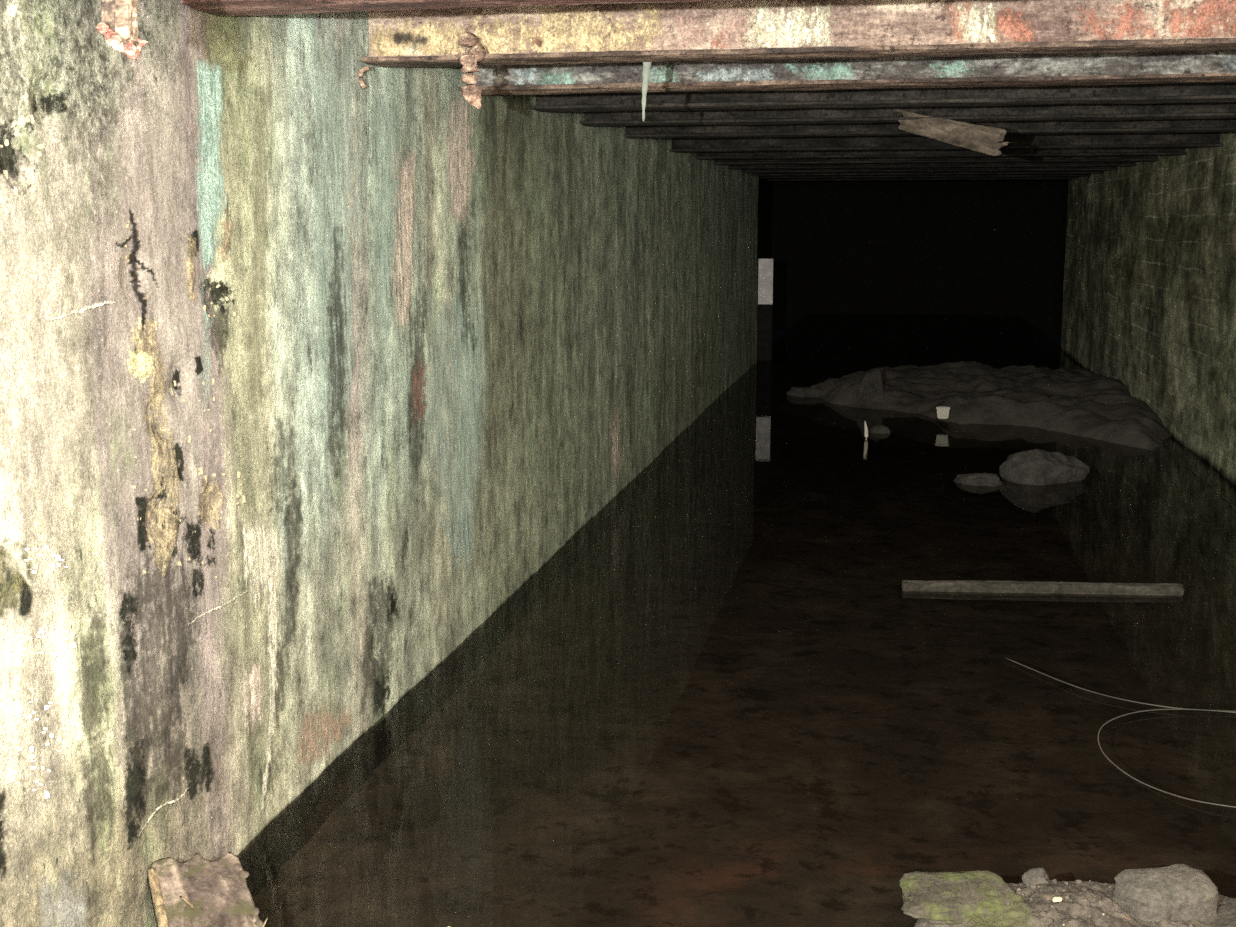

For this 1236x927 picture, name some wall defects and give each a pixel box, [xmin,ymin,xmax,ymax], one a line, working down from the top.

rust [994,3,1034,42]
rust [1076,0,1236,40]
crack [115,209,158,331]
leakage [24,545,65,574]
leakage [192,565,204,602]
leakage [119,593,138,675]
leakage [8,699,61,798]
leakage [124,734,146,849]
leakage [184,743,213,801]